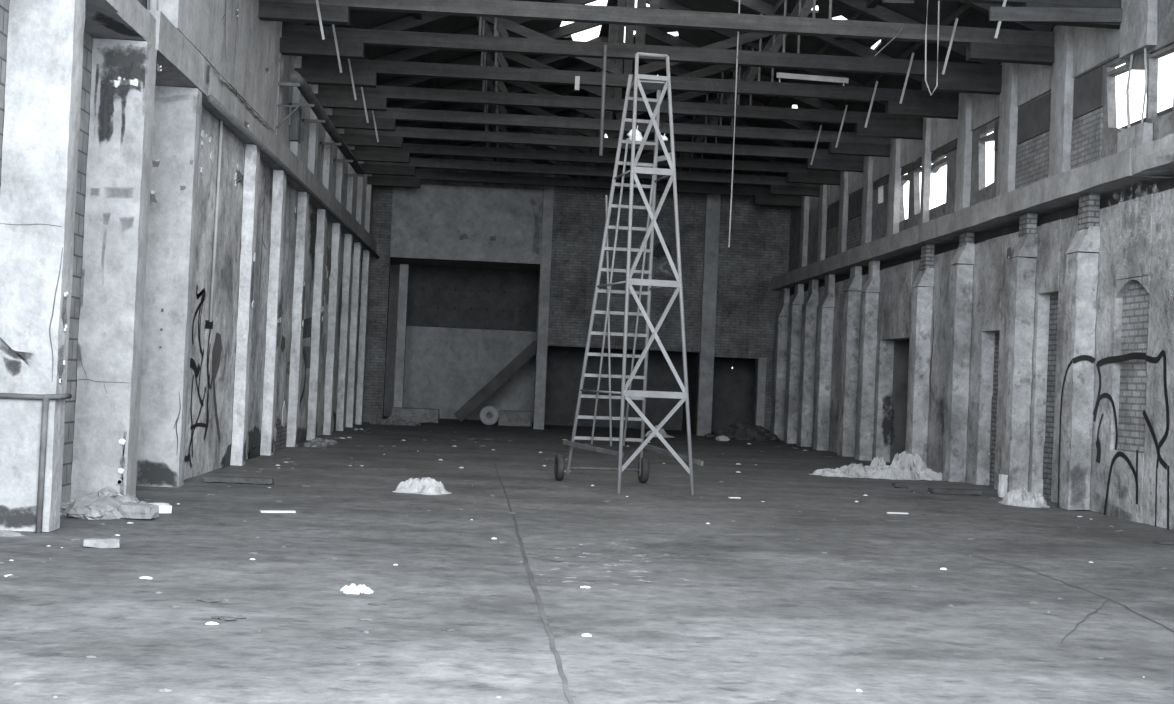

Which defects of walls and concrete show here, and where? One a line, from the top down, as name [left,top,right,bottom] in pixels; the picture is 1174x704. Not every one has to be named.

damp [94,68,125,141]
crack [495,465,586,704]
crack [932,546,1174,644]